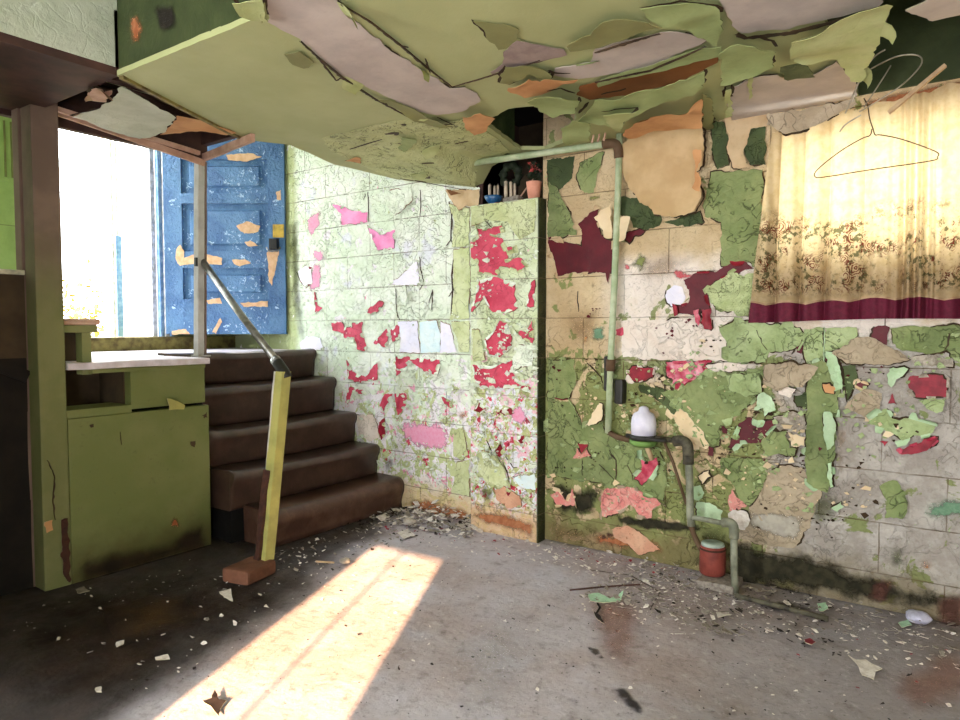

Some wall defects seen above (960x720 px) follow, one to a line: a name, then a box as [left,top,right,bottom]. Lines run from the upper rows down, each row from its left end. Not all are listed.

peeling [70,10,236,146]
peeling [226,153,261,162]
peeling [176,245,194,266]
peeling [207,254,250,266]
peeling [232,0,960,562]
leakage [84,528,204,579]
leakage [728,543,941,610]